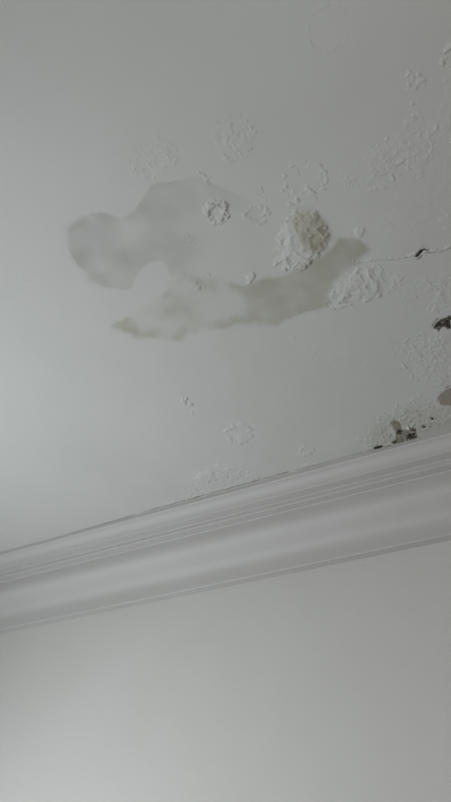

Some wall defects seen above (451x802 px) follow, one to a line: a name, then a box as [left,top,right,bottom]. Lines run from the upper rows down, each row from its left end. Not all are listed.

crack [350,244,451,266]
flaking render [433,316,451,332]
peeling [354,386,451,452]